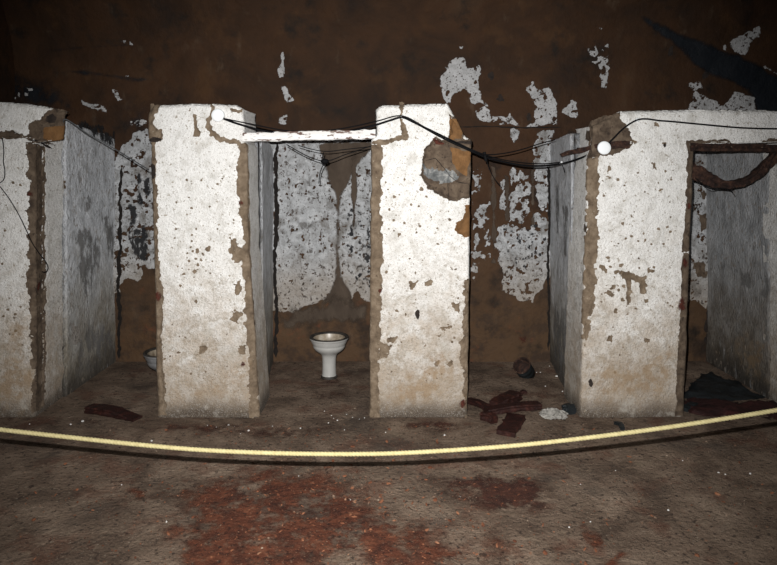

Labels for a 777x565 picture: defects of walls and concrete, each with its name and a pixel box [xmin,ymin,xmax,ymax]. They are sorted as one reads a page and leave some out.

peeling [277,52,294,102]
damp [645,18,777,111]
peeling [688,83,756,110]
peeling [723,26,761,55]
flaking render [0,109,69,413]
peeling [113,104,193,416]
flaking render [189,104,260,418]
peeling [268,102,409,418]
flaking render [408,258,433,300]
peeling [419,46,578,418]
flaking render [581,112,655,346]